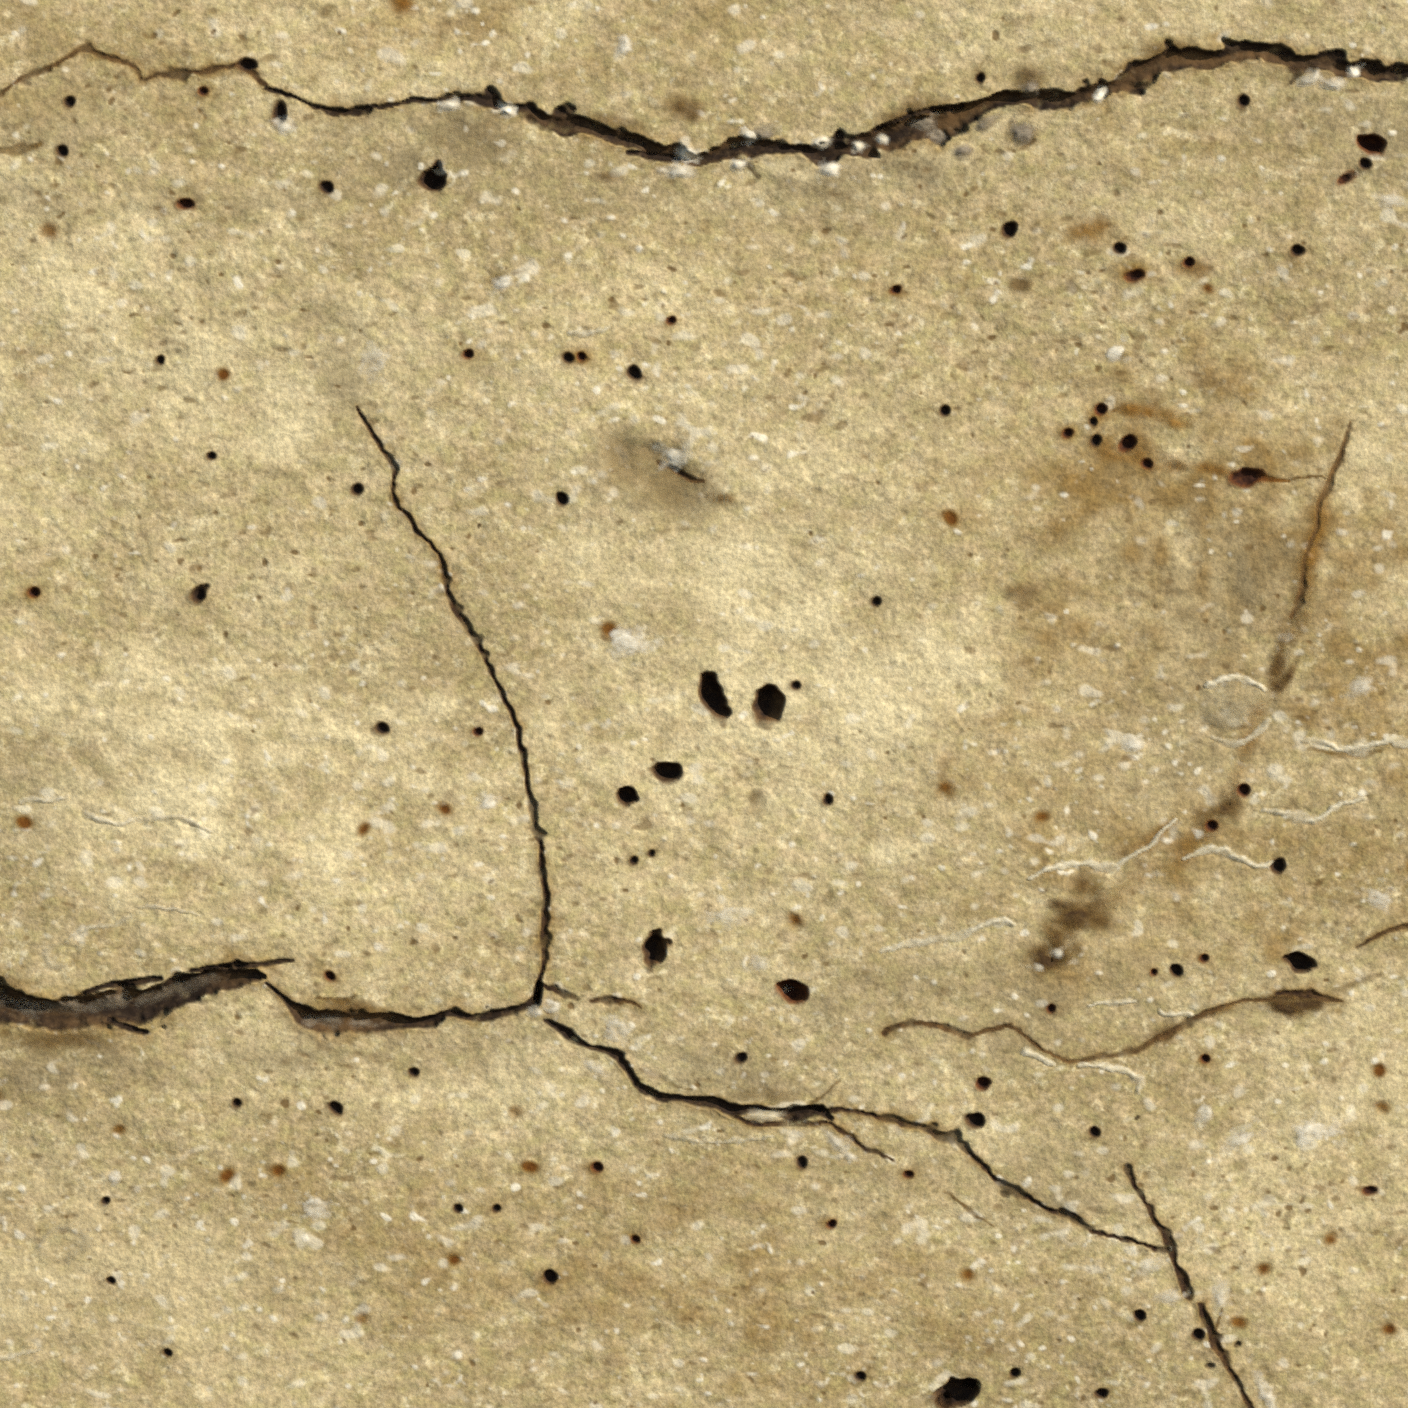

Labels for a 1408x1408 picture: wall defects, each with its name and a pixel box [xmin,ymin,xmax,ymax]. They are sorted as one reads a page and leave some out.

crack [0,39,1408,179]
crack [0,406,1275,1408]